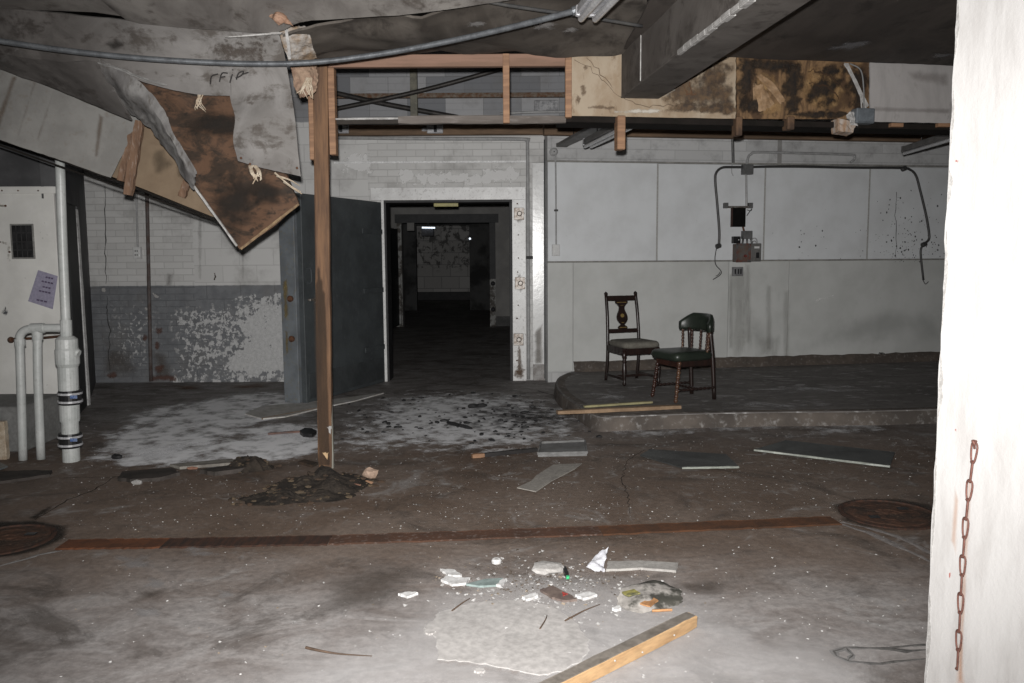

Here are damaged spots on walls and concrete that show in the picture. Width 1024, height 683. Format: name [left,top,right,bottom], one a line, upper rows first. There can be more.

crack [575,58,698,108]
damp [630,58,868,119]
peeling [171,293,284,382]